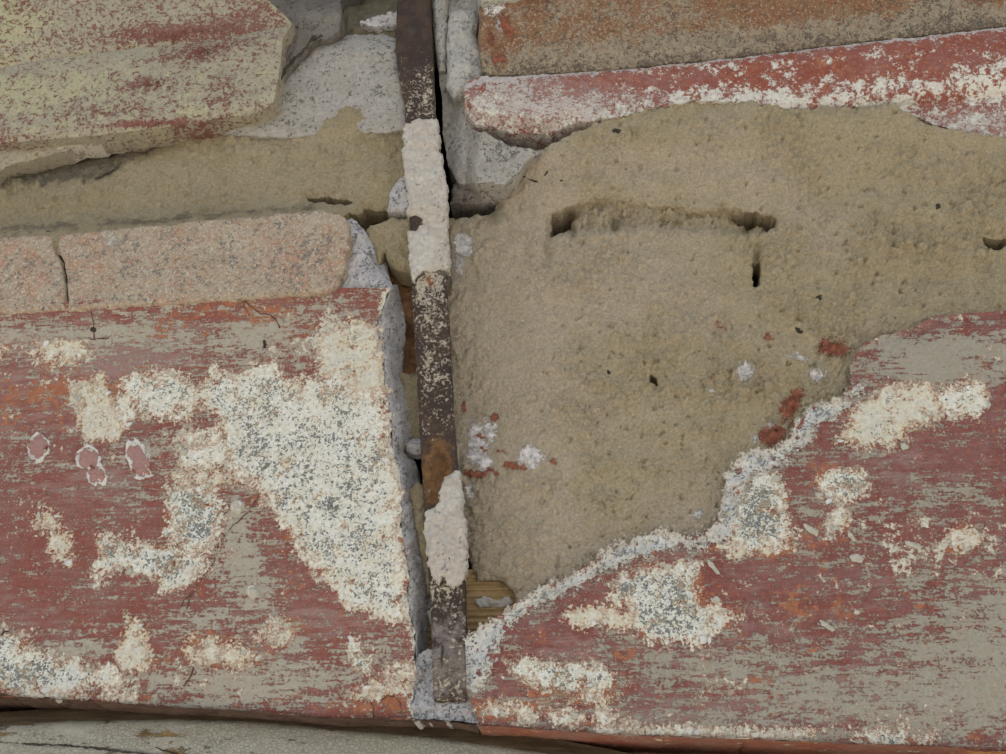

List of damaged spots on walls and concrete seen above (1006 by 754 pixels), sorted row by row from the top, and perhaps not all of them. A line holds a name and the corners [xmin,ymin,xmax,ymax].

crack [95,155,127,179]
spalling [387,176,408,220]
peeling [0,284,431,704]
spalling [463,336,994,741]
peeling [837,720,937,746]